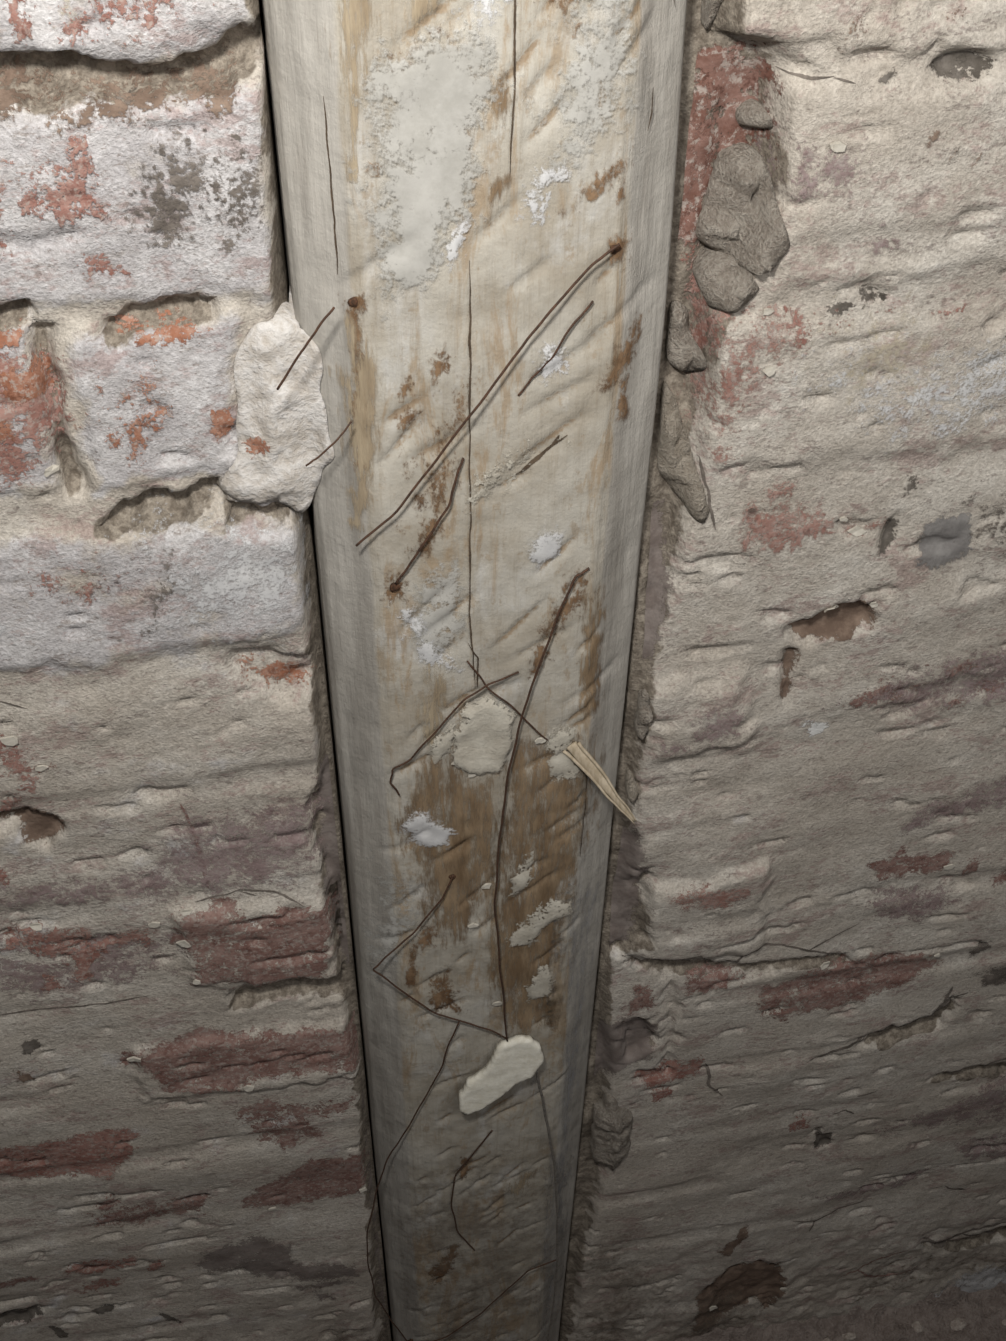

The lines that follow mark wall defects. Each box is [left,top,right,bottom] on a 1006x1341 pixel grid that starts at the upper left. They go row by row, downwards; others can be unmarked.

crack [468,260,479,687]
crack [516,435,567,475]
spalling [913,480,1006,576]
spalling [780,600,878,698]
crack [579,775,587,856]
peeling [395,662,605,1115]
rust [406,926,461,1015]
crack [810,987,968,1061]
spalling [692,1224,788,1332]